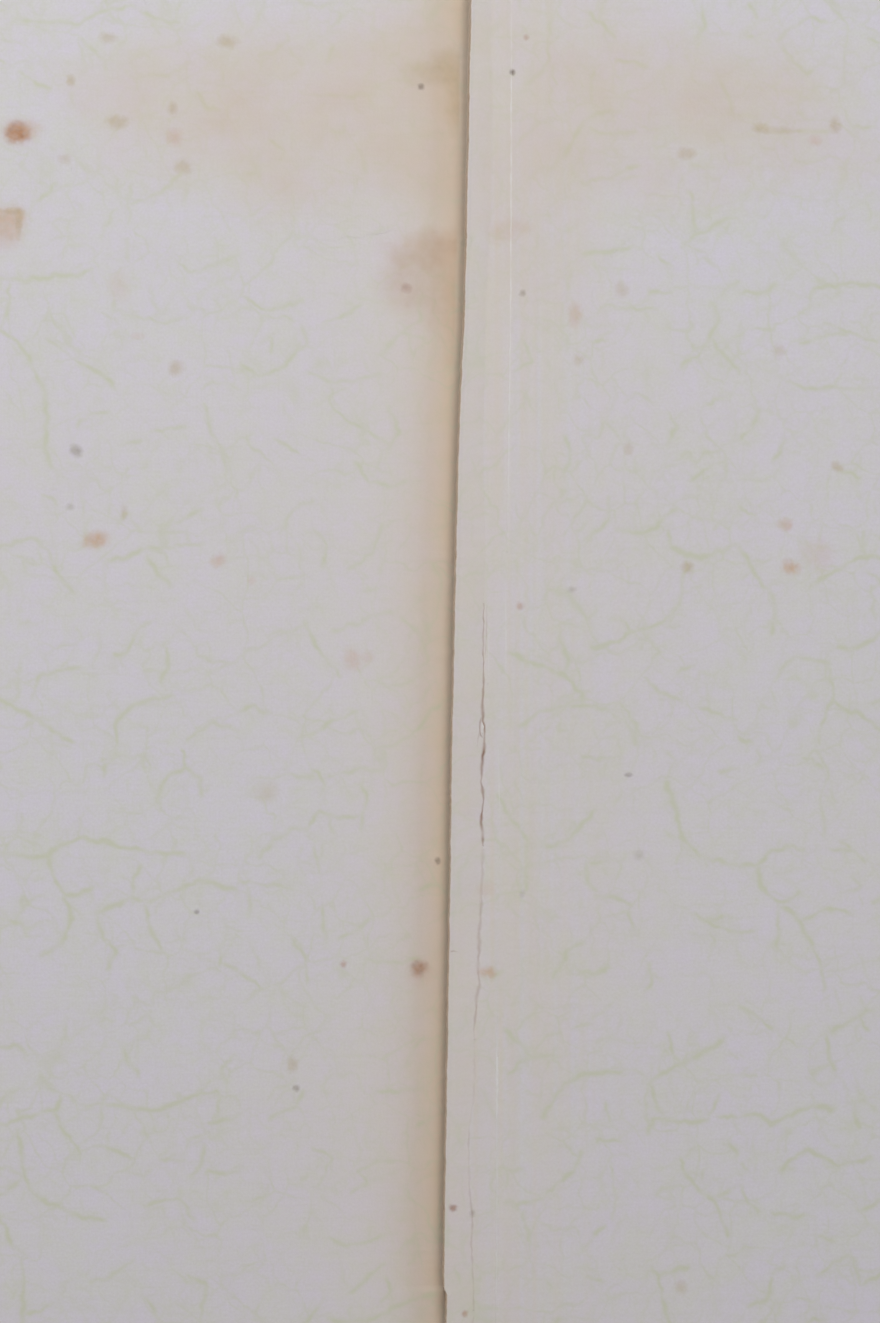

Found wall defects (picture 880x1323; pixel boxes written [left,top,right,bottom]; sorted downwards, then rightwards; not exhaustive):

crack [473,603,488,1040]